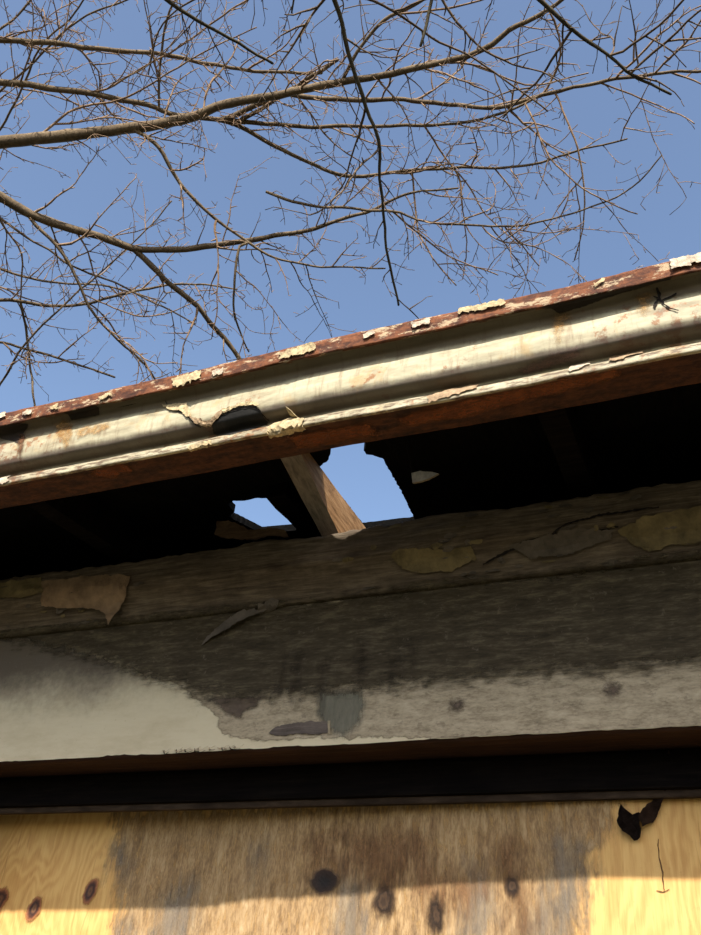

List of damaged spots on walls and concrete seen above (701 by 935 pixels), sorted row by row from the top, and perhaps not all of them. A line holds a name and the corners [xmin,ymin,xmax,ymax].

peeling [609,350,644,362]
peeling [427,383,479,403]
rust [401,368,620,426]
spalling [162,401,306,452]
peeling [391,525,477,574]
peeling [594,506,701,552]
peeling [0,573,144,624]
peeling [269,721,331,736]
damp [110,801,620,935]